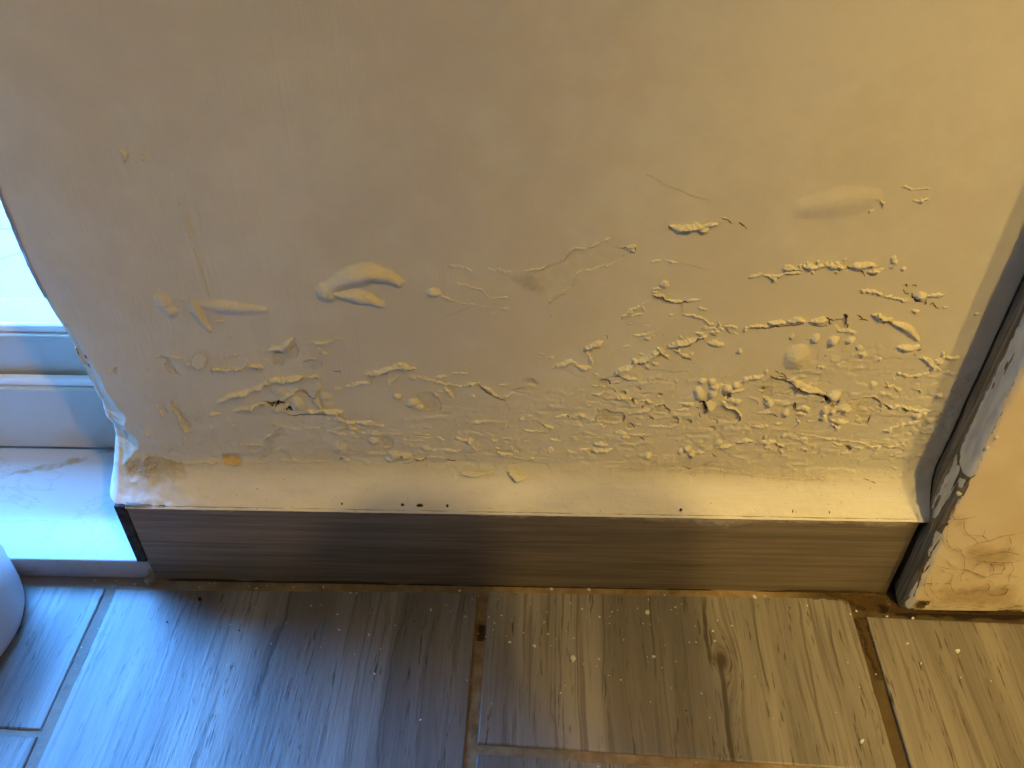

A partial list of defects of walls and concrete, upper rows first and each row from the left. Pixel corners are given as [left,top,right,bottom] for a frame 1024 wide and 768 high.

peeling [206,336,345,405]
peeling [491,280,960,460]
peeling [138,453,330,478]
peeling [905,313,1024,609]
crack [899,475,1021,609]